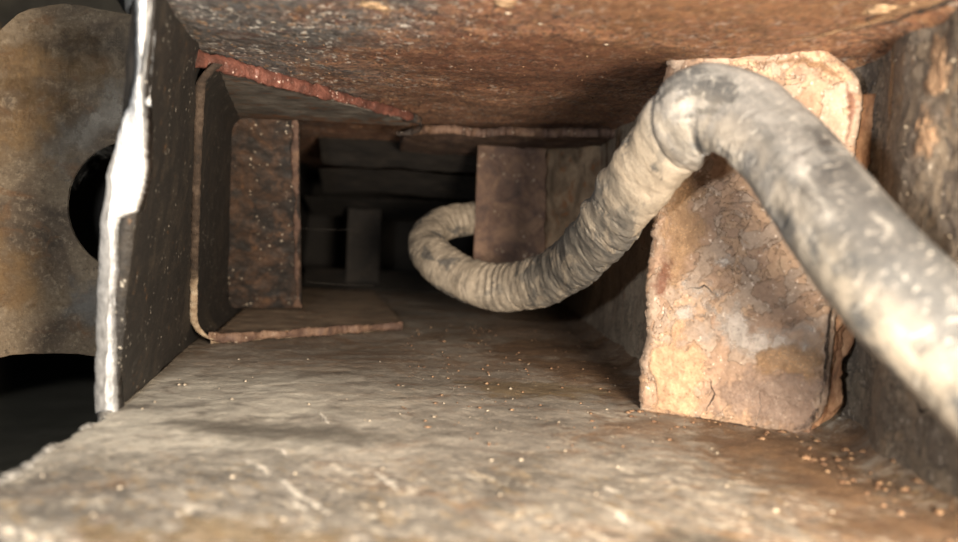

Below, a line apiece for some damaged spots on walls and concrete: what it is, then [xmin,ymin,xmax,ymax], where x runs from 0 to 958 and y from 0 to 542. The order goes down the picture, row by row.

rust [767,58,836,75]
rust [847,89,876,173]